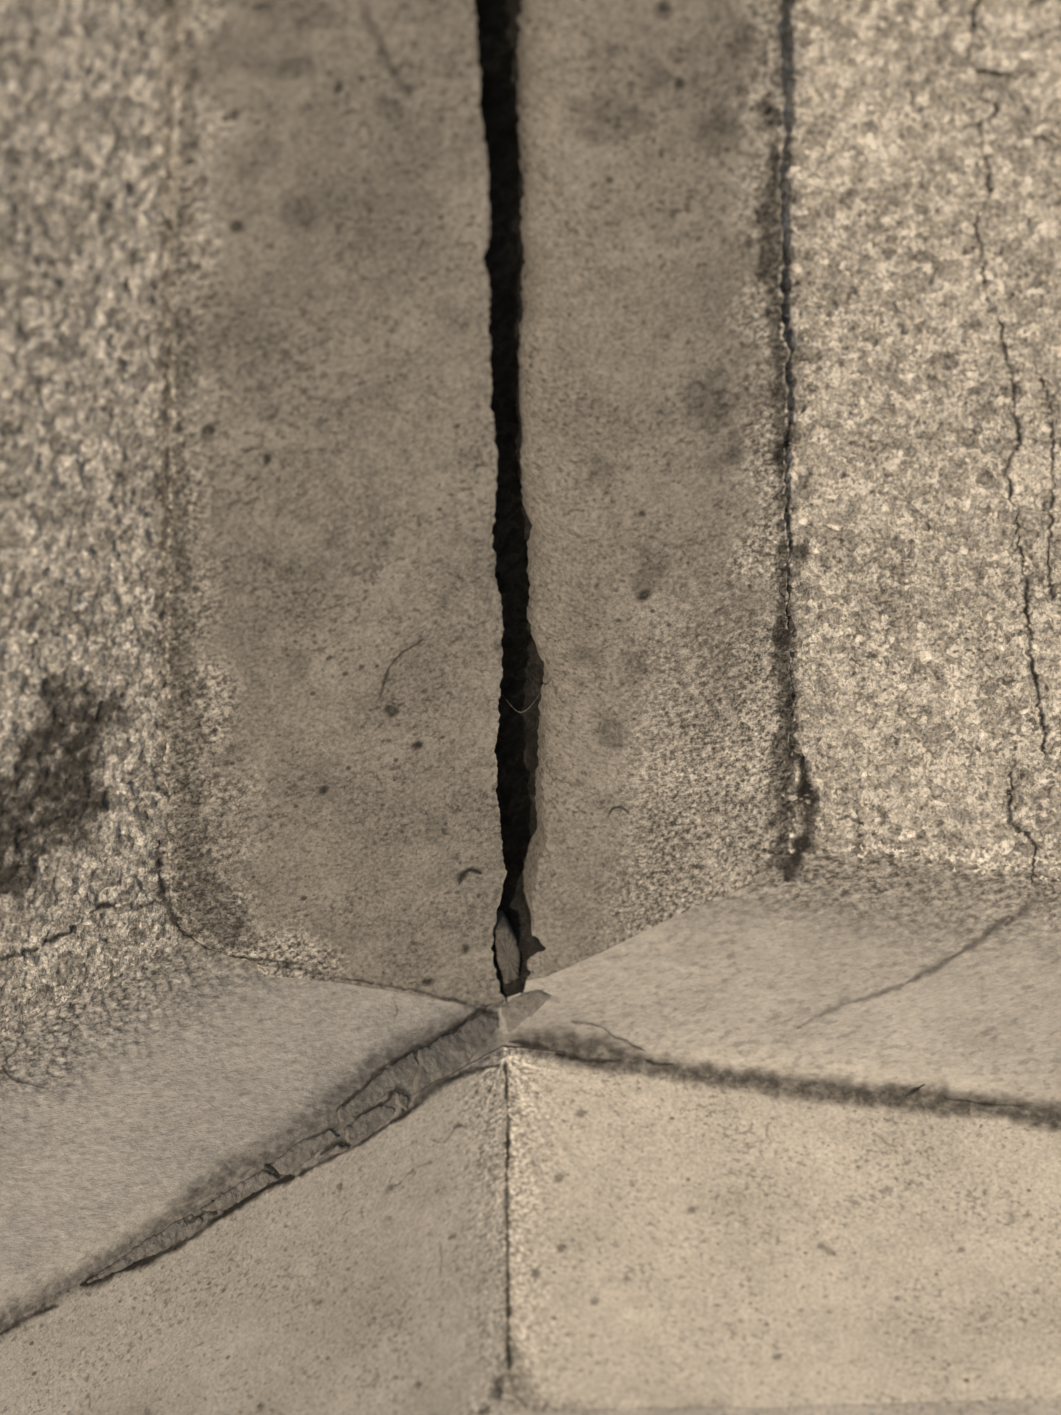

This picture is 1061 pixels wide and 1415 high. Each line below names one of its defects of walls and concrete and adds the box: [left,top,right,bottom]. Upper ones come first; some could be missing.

crack [968,0,1061,754]
leakage [0,676,120,899]
crack [906,771,1037,984]
crack [0,980,673,1370]
crack [905,1084,925,1097]